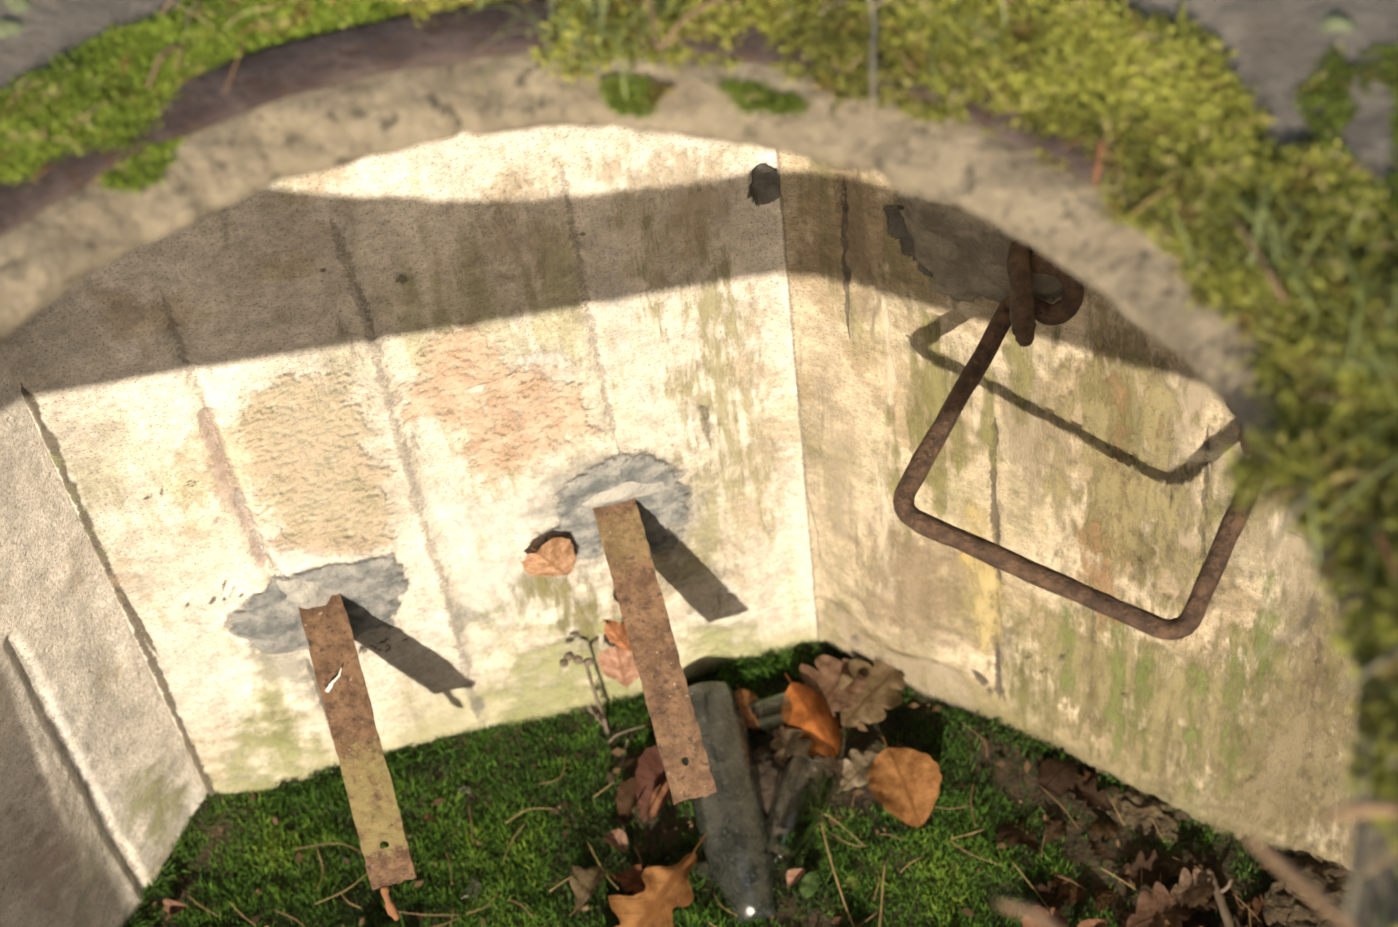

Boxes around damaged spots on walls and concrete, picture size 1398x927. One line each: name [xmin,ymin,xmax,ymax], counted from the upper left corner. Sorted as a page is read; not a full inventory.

spalling [883,205,917,261]
damp [872,291,932,560]
corrosion [960,552,1004,655]
damp [953,331,1079,526]
corrosion [1077,342,1129,596]
damp [1106,617,1153,770]
damp [1185,574,1359,870]
damp [1272,510,1287,556]